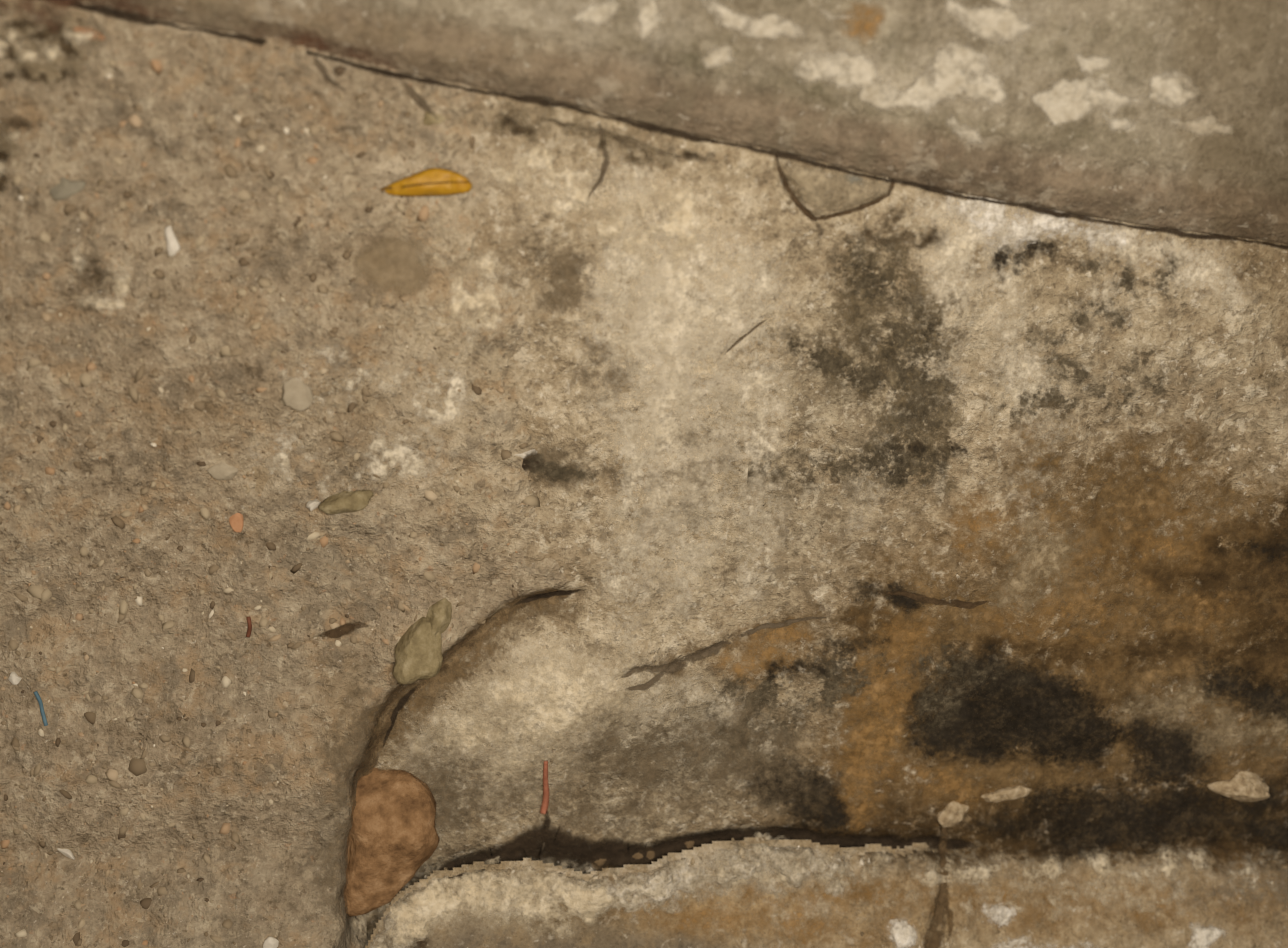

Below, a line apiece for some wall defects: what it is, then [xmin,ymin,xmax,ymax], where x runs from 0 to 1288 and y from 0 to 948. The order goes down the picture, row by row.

water stain [253,433,312,481]
water stain [318,147,1288,926]
crack [319,621,368,638]
crack [353,589,579,790]
crack [622,591,988,690]
water stain [366,833,891,948]
crack [438,812,972,948]
water stain [890,899,917,948]
water stain [999,937,1035,948]
water stain [1189,926,1225,948]